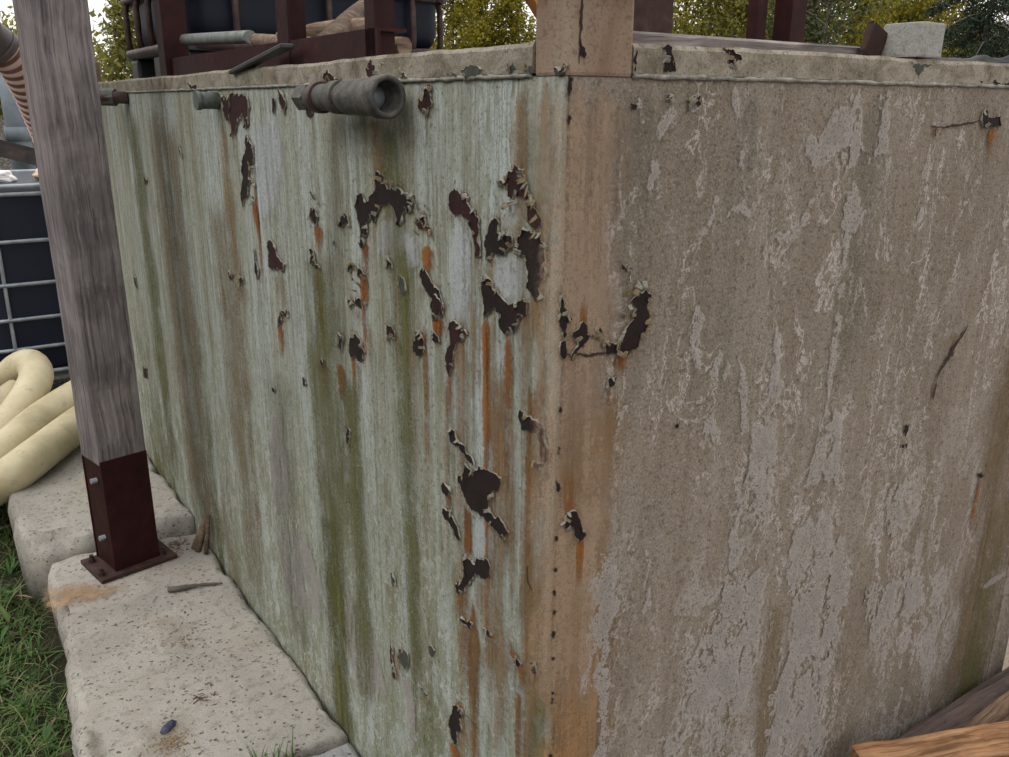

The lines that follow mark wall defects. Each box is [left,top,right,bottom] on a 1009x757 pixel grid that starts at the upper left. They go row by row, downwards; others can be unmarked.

peeling [219,92,258,228]
leakage [151,120,229,526]
peeling [307,191,335,314]
peeling [317,332,365,401]
peeling [337,163,468,412]
leakage [398,251,421,685]
peeling [441,151,561,757]
corrosion [454,83,631,757]
peeling [555,465,586,581]
peeling [557,264,652,439]
peeling [389,645,409,680]